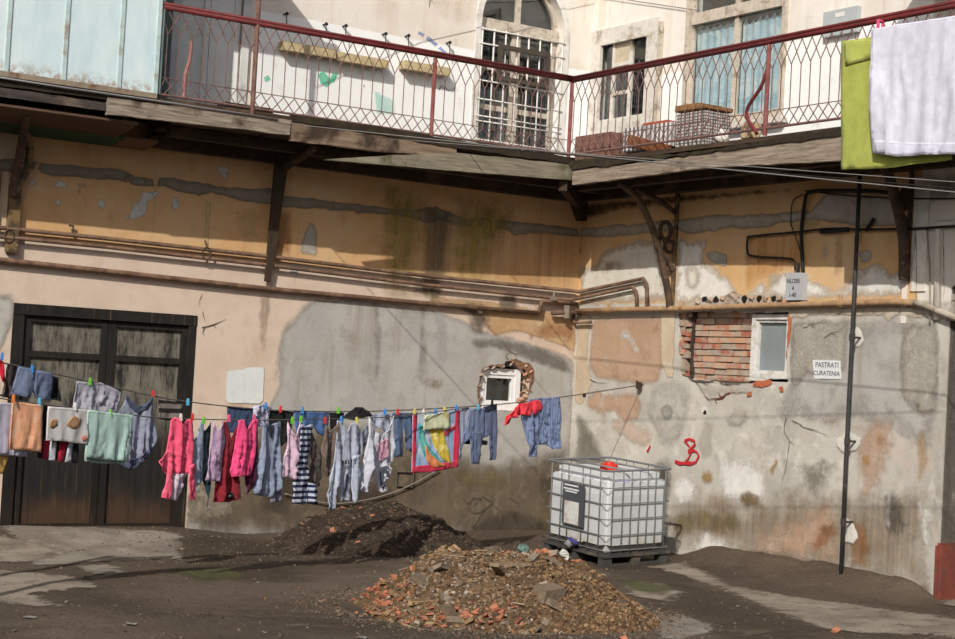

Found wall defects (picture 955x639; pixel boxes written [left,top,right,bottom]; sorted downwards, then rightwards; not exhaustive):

peeling [126,191,158,219]
peeling [301,223,317,254]
damp [422,212,448,297]
peeling [581,231,922,357]
peeling [431,297,575,351]
spalling [477,356,534,408]
flaking render [702,380,783,396]
peeling [588,392,650,445]
crack [782,417,826,478]
damp [659,460,930,591]